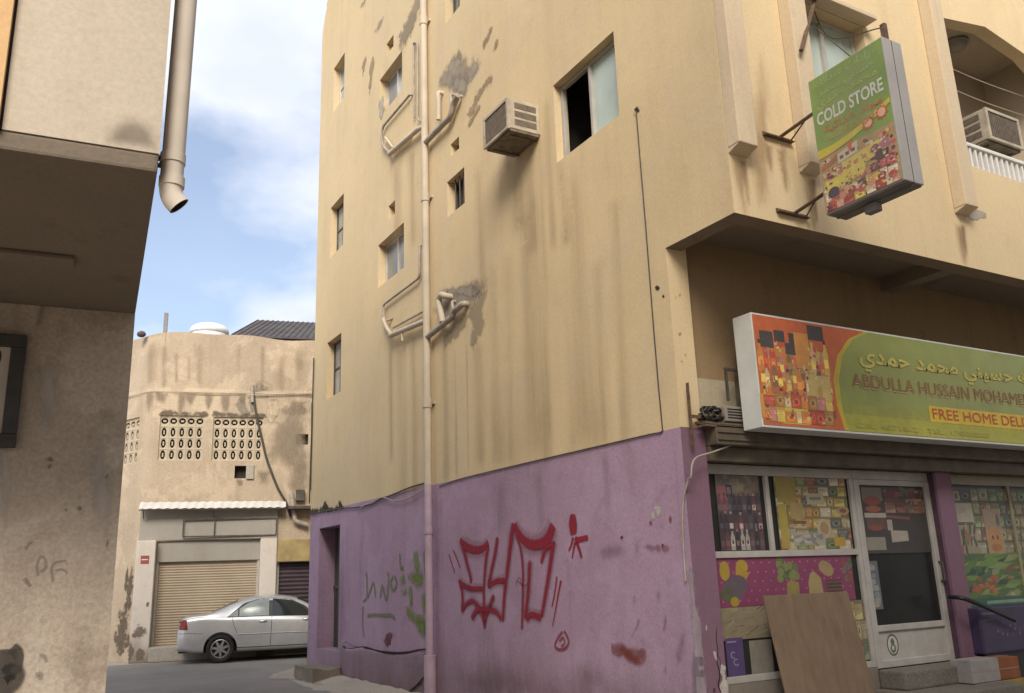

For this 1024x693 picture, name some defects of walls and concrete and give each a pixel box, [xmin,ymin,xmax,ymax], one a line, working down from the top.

peeling [467,75,492,126]
leakage [147,383,267,418]
spalling [114,568,133,656]